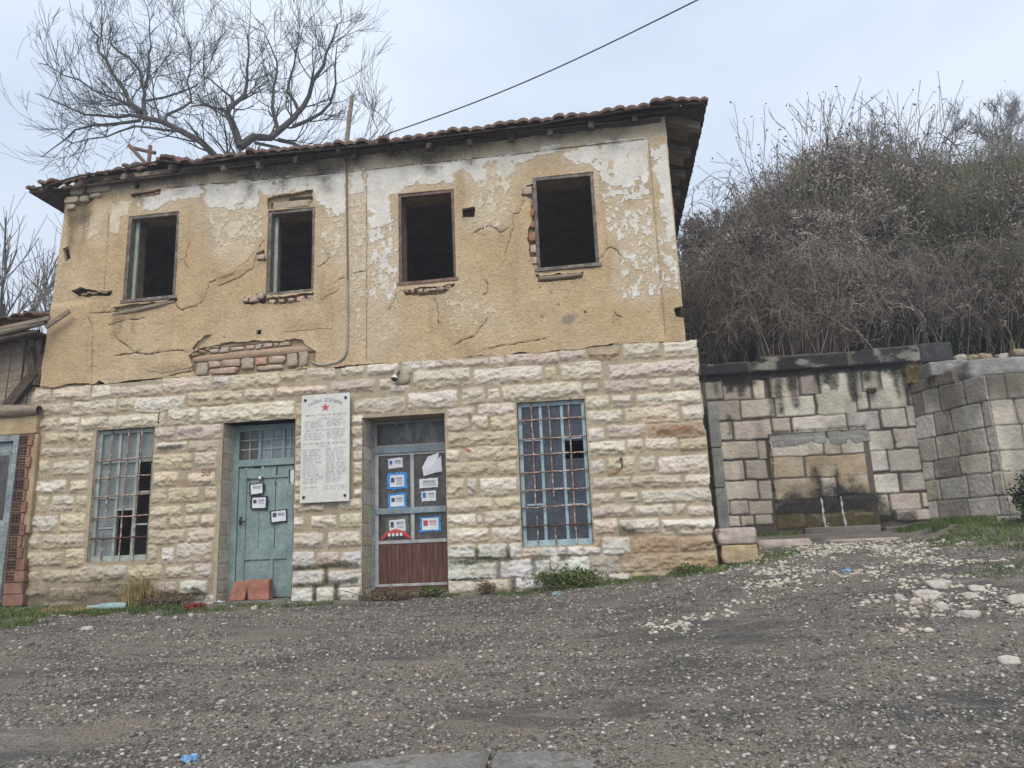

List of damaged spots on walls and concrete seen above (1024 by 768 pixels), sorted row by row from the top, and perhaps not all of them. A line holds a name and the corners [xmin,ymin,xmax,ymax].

peeling [64,137,679,351]
crack [475,204,523,257]
crack [88,305,196,376]
flaking render [191,331,316,376]
crack [436,281,546,349]
damp [699,361,909,414]
damp [782,470,885,513]